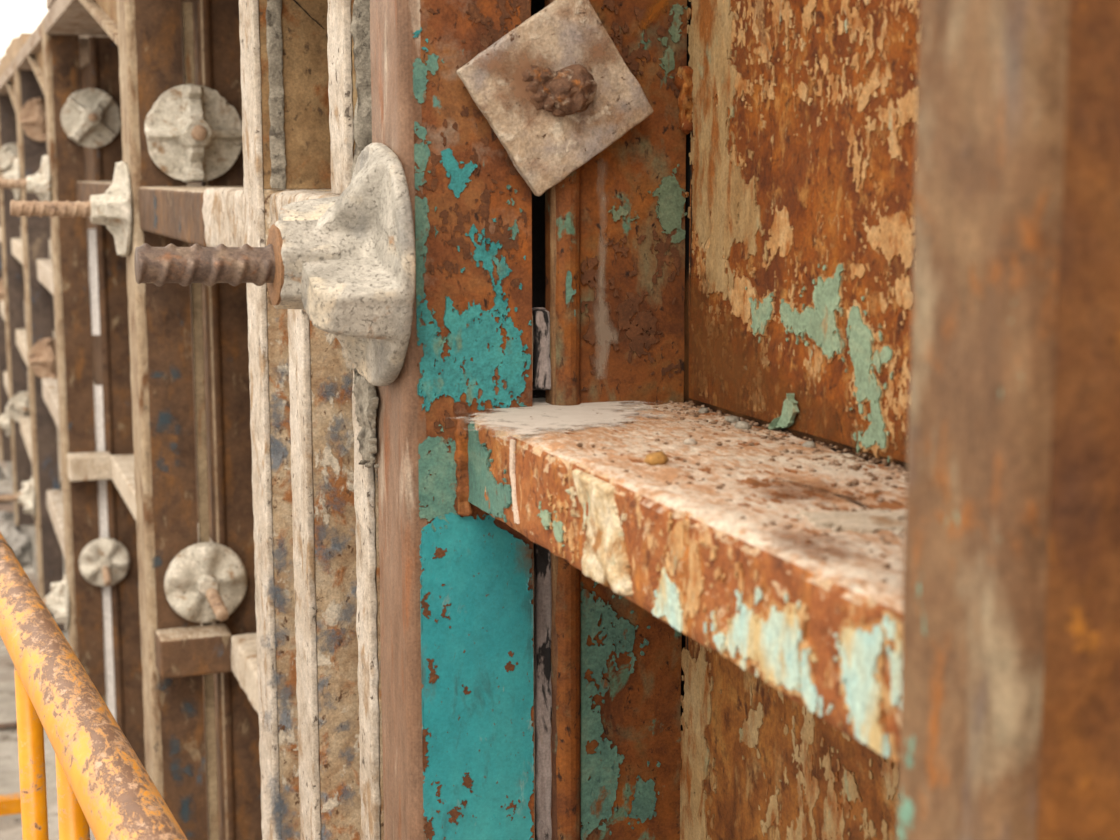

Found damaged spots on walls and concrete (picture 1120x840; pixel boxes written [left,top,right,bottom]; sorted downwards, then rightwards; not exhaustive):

peeling [412,28,444,104]
rust [461,0,530,59]
rust [601,0,680,97]
rust [423,137,530,287]
peeling [647,0,920,463]
peeling [414,121,534,840]
peeling [537,474,579,564]
spalling [796,508,906,536]
rust [420,584,451,628]
rust [426,658,439,684]
peeling [581,512,903,840]
rust [422,728,473,840]